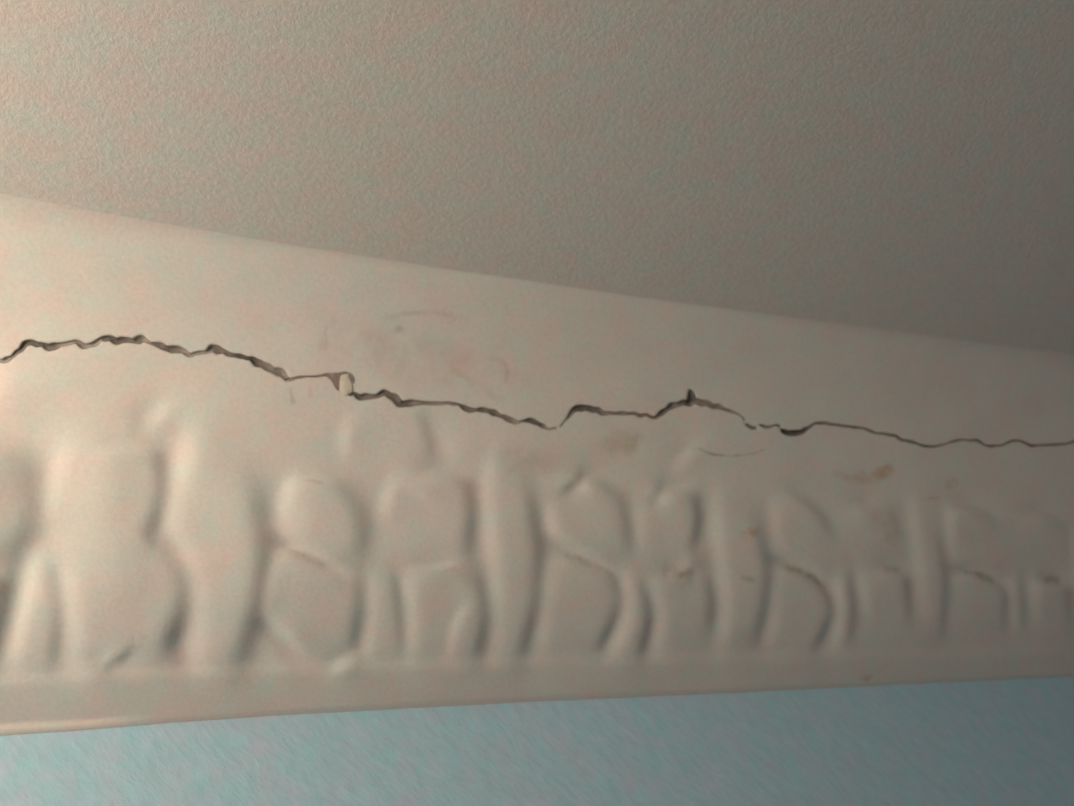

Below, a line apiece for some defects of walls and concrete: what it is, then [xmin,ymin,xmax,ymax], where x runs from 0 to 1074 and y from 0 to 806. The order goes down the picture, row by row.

crack [0,335,330,381]
crack [349,389,1074,448]